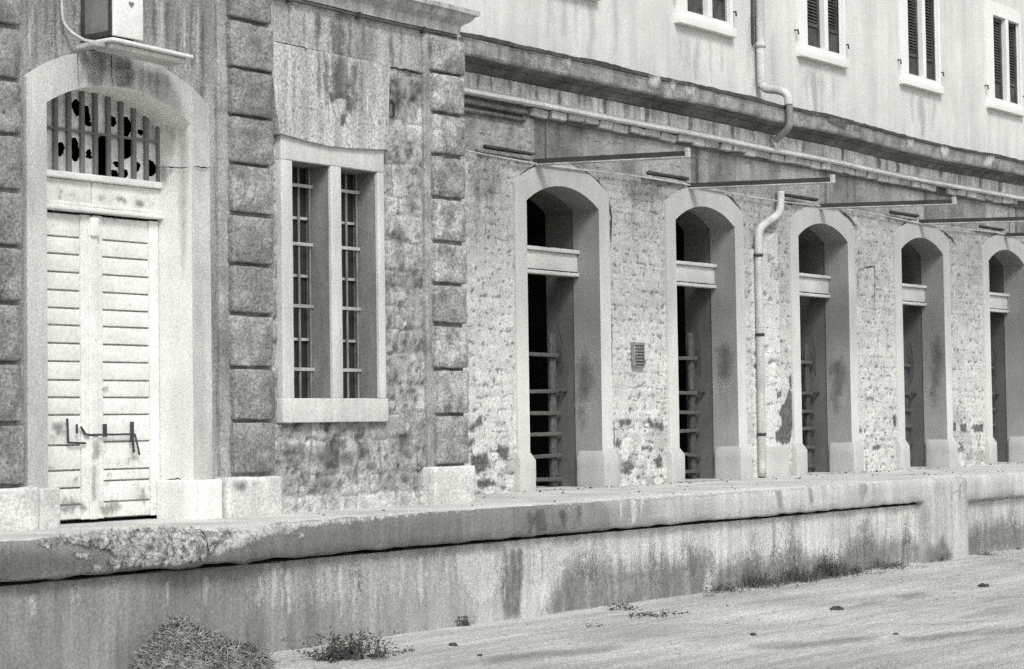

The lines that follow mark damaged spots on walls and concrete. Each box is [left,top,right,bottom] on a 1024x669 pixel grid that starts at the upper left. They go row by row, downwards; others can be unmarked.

water stain [318,26,357,112]
water stain [255,571,297,613]
water stain [311,543,706,619]
water stain [717,540,951,590]